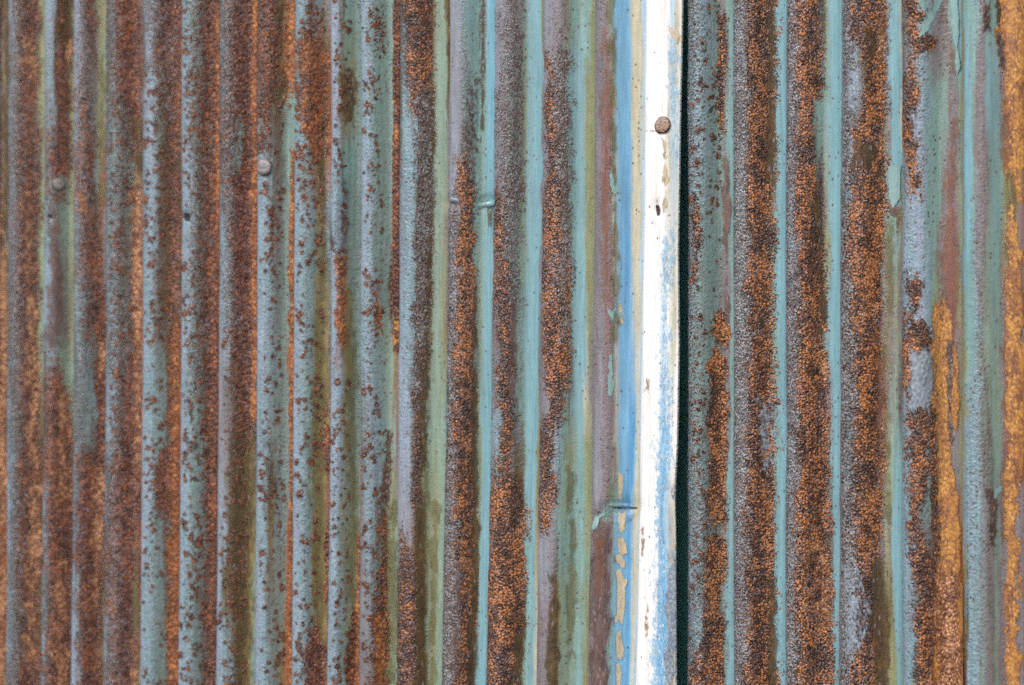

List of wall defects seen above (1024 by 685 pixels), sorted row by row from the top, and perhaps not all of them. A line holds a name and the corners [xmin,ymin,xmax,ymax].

corrosion [0,0,578,685]
peeling [615,472,627,685]
corrosion [687,0,943,685]